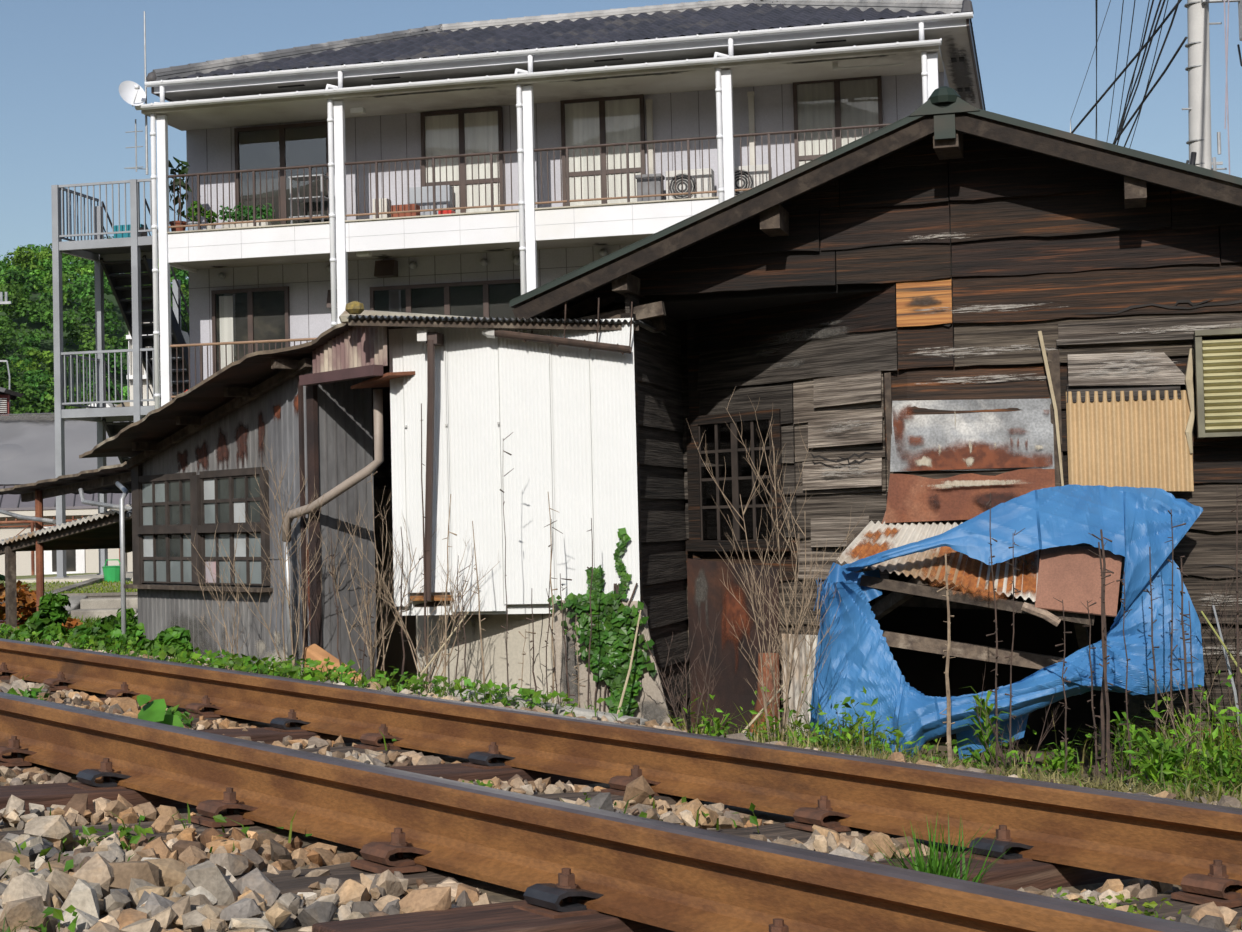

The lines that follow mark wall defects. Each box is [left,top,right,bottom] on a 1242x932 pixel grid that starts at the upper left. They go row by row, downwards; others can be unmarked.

damp [949,44,975,101]
rust [892,405,1053,471]
rust [974,492,1017,508]
rust [848,528,899,559]
rust [922,546,1037,598]